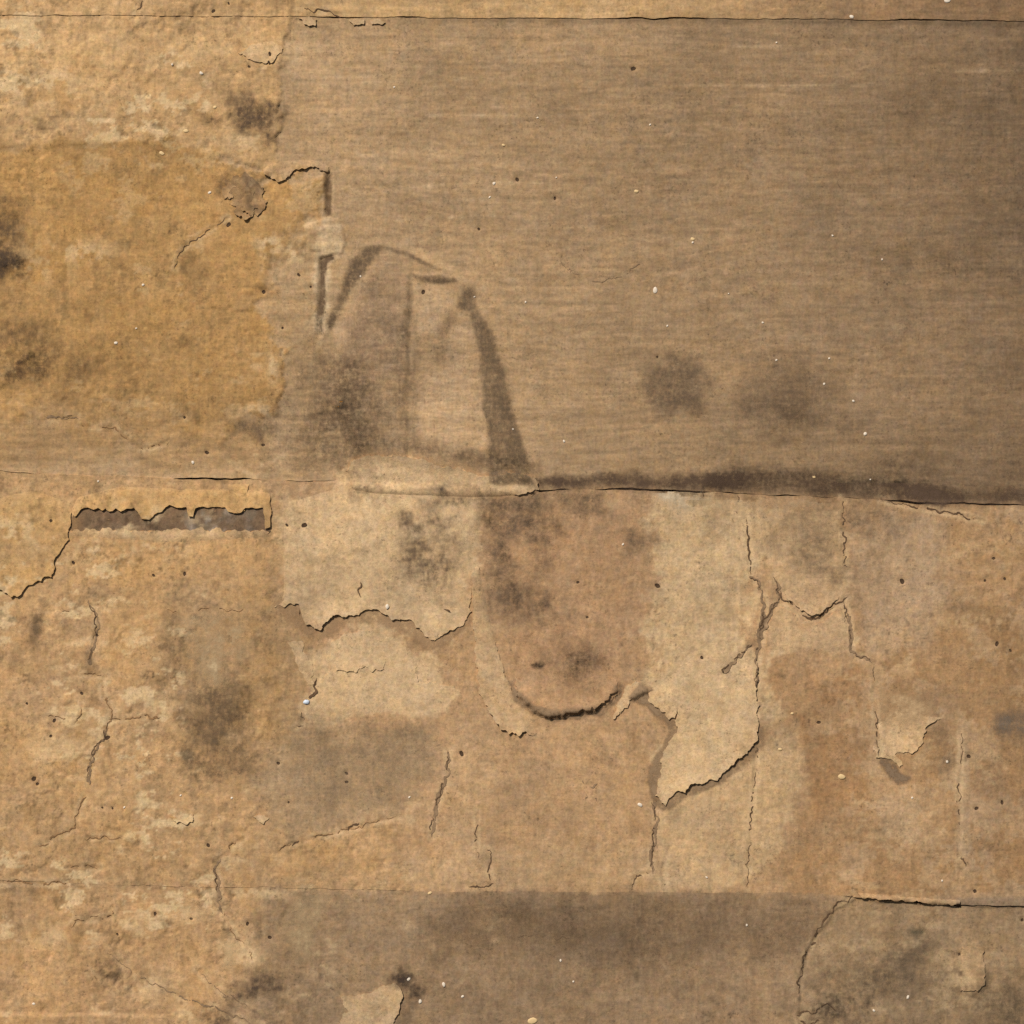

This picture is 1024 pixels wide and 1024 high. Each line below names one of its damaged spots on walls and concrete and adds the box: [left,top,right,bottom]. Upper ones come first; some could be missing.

water stain [318,255,335,324]
water stain [339,247,379,301]
water stain [459,290,775,505]
peeling [0,484,272,597]
peeling [275,455,539,736]
water stain [405,541,449,579]
crack [721,496,875,687]
water stain [867,483,969,507]
crack [429,752,451,837]
peeling [613,644,763,810]
peeling [873,695,943,785]
crack [796,896,853,1024]